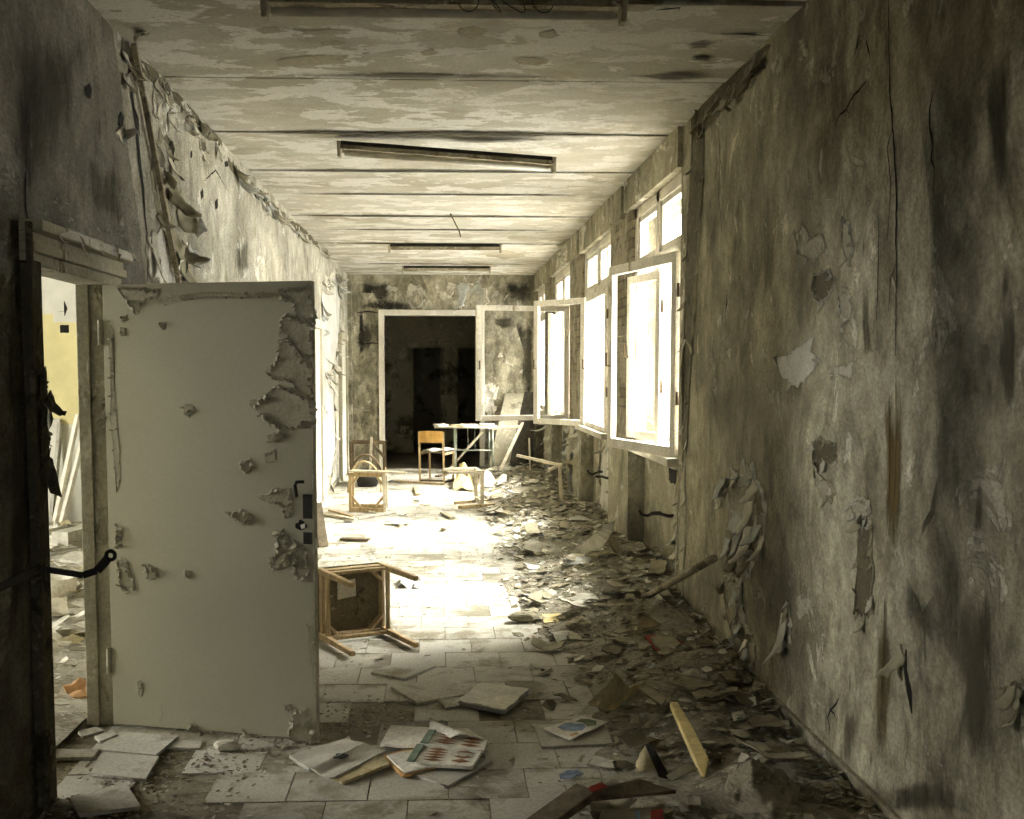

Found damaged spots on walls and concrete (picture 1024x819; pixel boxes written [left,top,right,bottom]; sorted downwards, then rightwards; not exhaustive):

crack [835,0,897,352]
crack [928,94,936,192]
peeling [57,28,352,493]
damp [359,284,411,351]
damp [508,282,529,300]
peeling [472,44,888,819]
peeling [257,487,311,582]
peeling [875,643,906,678]
peeling [995,680,1023,729]